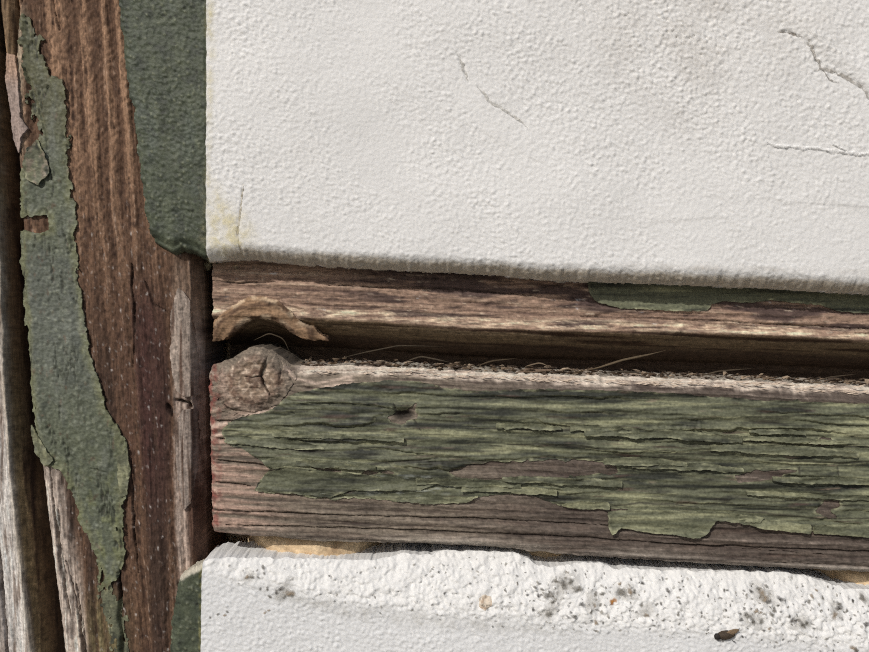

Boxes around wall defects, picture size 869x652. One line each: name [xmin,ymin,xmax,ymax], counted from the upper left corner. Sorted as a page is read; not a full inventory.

crack [779,32,869,99]
crack [767,142,869,156]
peeling [17,13,131,652]
peeling [222,379,869,539]